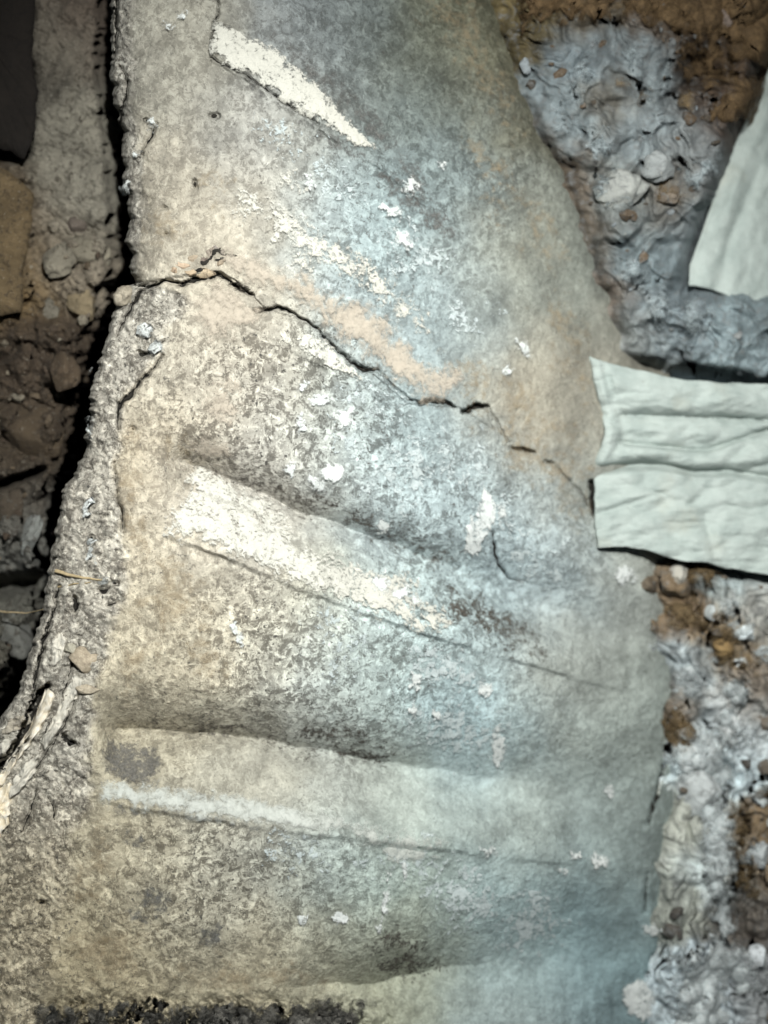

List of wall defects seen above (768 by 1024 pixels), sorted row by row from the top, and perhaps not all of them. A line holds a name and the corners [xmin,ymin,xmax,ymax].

peeling [208,20,376,149]
crack [118,273,385,377]
crack [117,342,162,426]
crack [409,399,588,506]